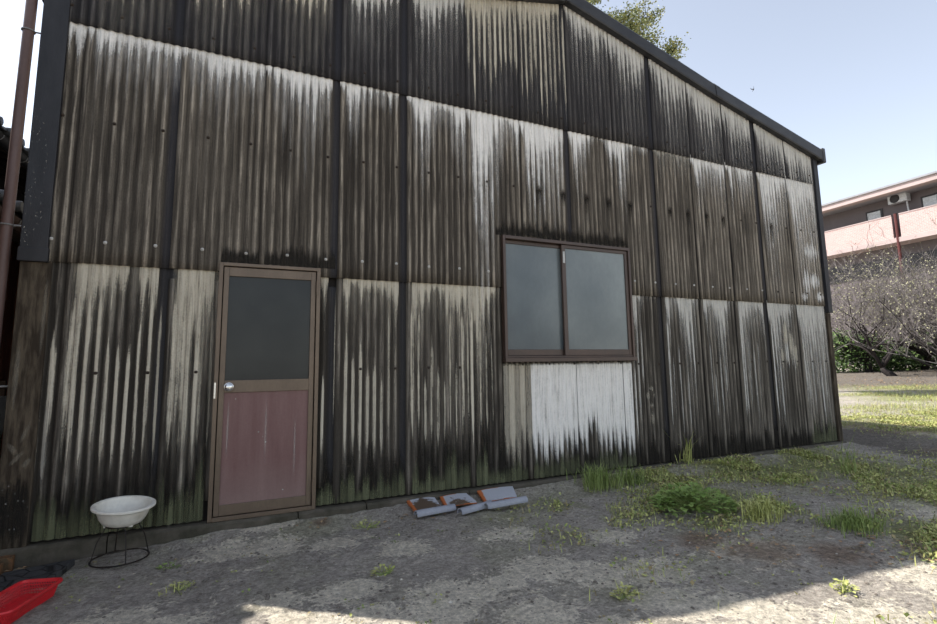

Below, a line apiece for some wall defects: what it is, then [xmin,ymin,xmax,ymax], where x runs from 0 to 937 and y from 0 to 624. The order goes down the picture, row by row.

water stain [352,0,399,15]
water stain [69,21,590,216]
water stain [414,0,816,232]
water stain [221,247,336,297]
water stain [343,278,399,311]
water stain [496,221,627,247]
water stain [0,263,215,545]
water stain [320,333,406,503]
water stain [410,282,838,493]